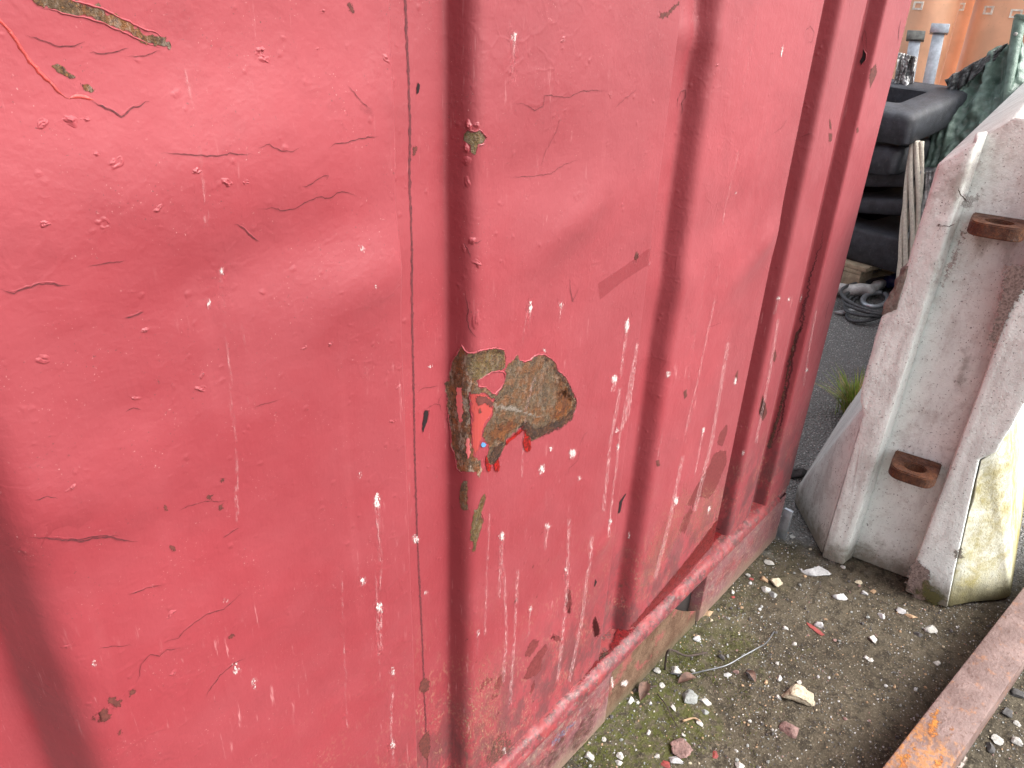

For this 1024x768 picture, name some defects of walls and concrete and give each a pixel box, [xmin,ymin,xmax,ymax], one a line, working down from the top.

crack [27,35,156,57]
crack [93,101,146,118]
crack [161,144,298,157]
peeling [461,119,487,188]
crack [513,90,598,178]
crack [268,175,353,211]
corrosion [443,344,577,552]
crack [32,535,137,543]
crack [104,597,236,672]